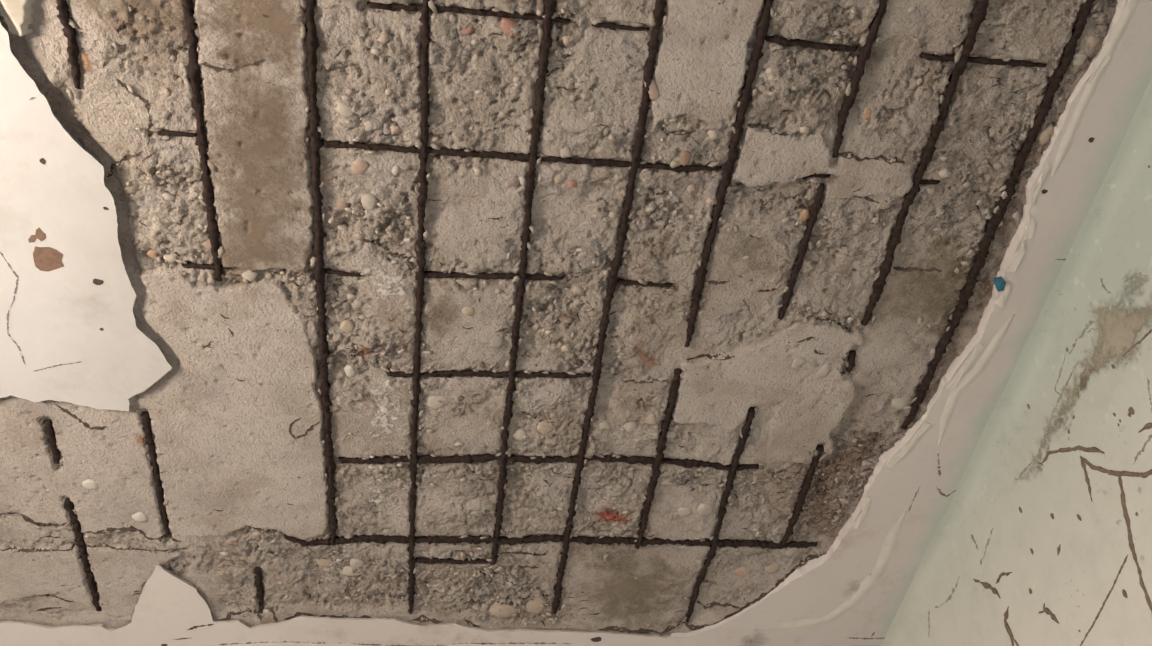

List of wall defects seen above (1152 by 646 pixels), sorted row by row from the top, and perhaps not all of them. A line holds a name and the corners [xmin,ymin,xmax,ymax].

spalling [0,0,331,629]
spalling [313,0,423,539]
spalling [171,463,729,636]
rust [594,510,627,521]
spalling [414,0,1117,631]